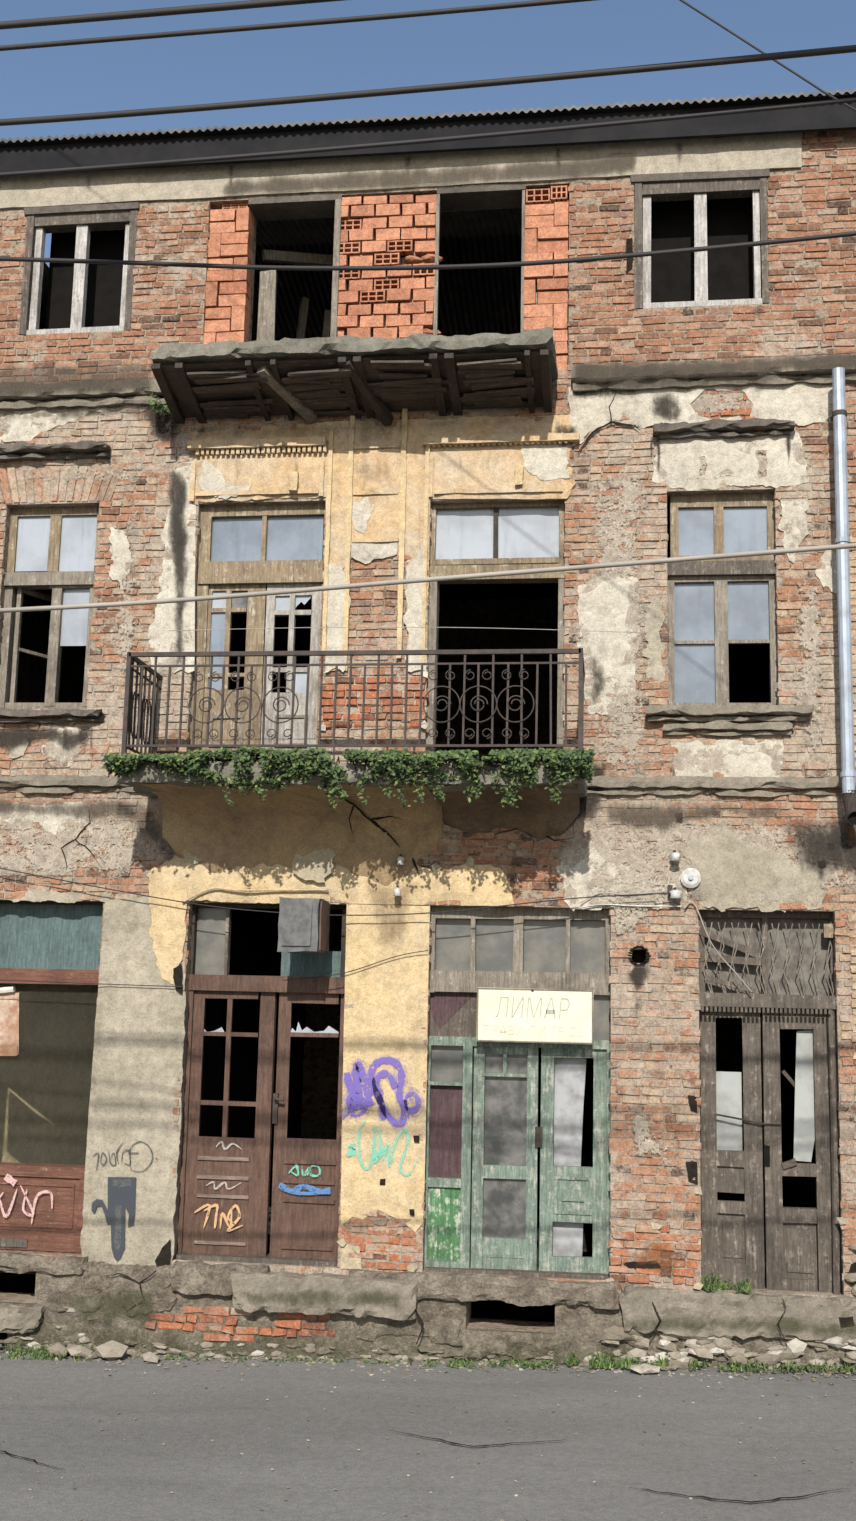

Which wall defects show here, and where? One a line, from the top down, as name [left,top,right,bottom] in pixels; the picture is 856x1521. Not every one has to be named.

flaking render [564,374,833,491]
damp [169,473,187,662]
damp [567,437,856,946]
crack [61,818,102,868]
crack [336,793,418,873]
spalling [628,945,651,965]
damp [626,1097,679,1168]
spalling [688,1095,698,1113]
spalling [686,1161,698,1185]
spalling [337,1209,417,1272]
spalling [606,1222,703,1290]
spalling [145,1306,336,1342]